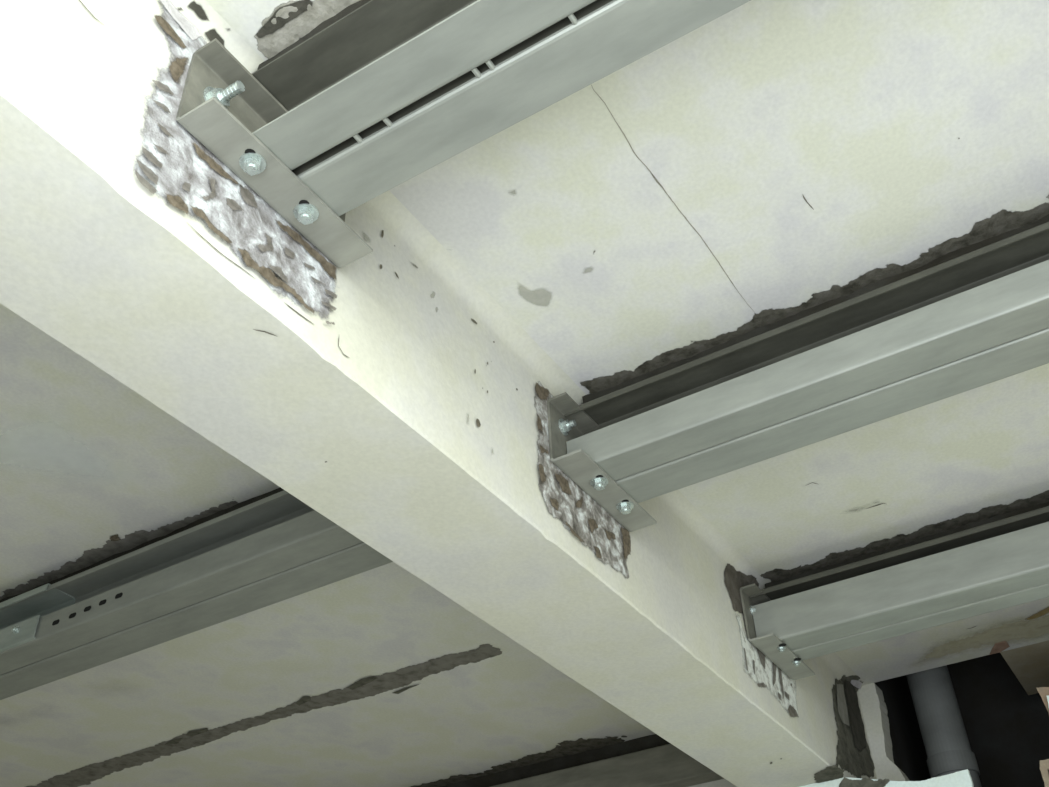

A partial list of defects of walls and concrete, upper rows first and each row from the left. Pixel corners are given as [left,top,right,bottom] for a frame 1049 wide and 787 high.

spalling [155,15,186,48]
spalling [178,1,229,46]
spalling [254,0,360,59]
crack [591,85,755,313]
spalling [165,728,208,745]
spalling [411,736,627,787]
spalling [814,675,890,787]